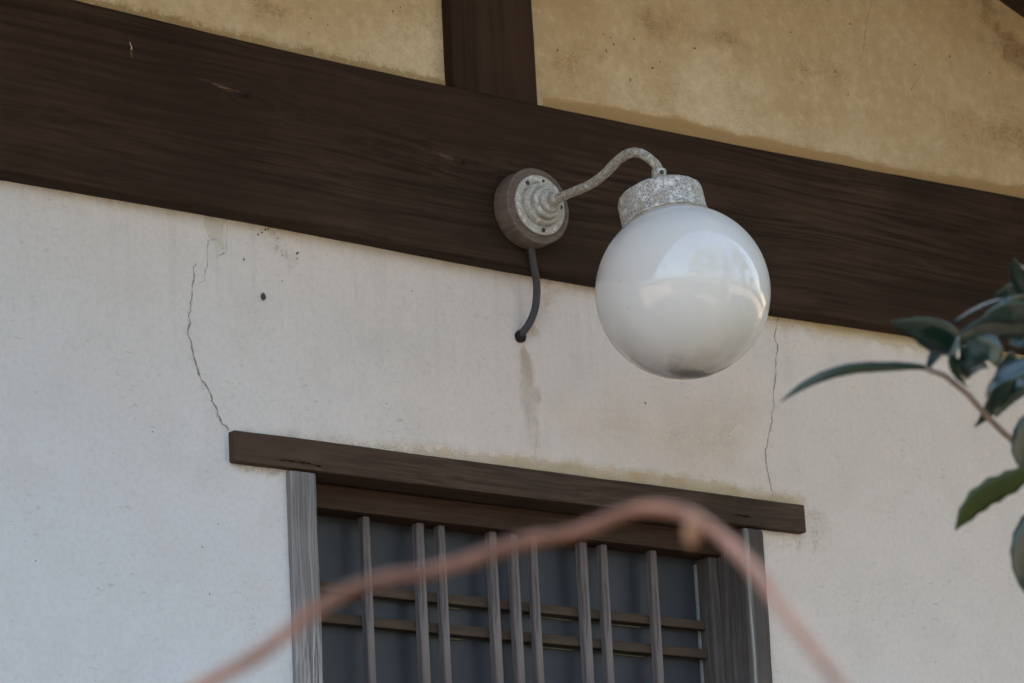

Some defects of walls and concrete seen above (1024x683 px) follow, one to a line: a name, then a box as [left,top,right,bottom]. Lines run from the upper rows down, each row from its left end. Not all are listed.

crack [185,227,229,430]
crack [765,317,778,497]